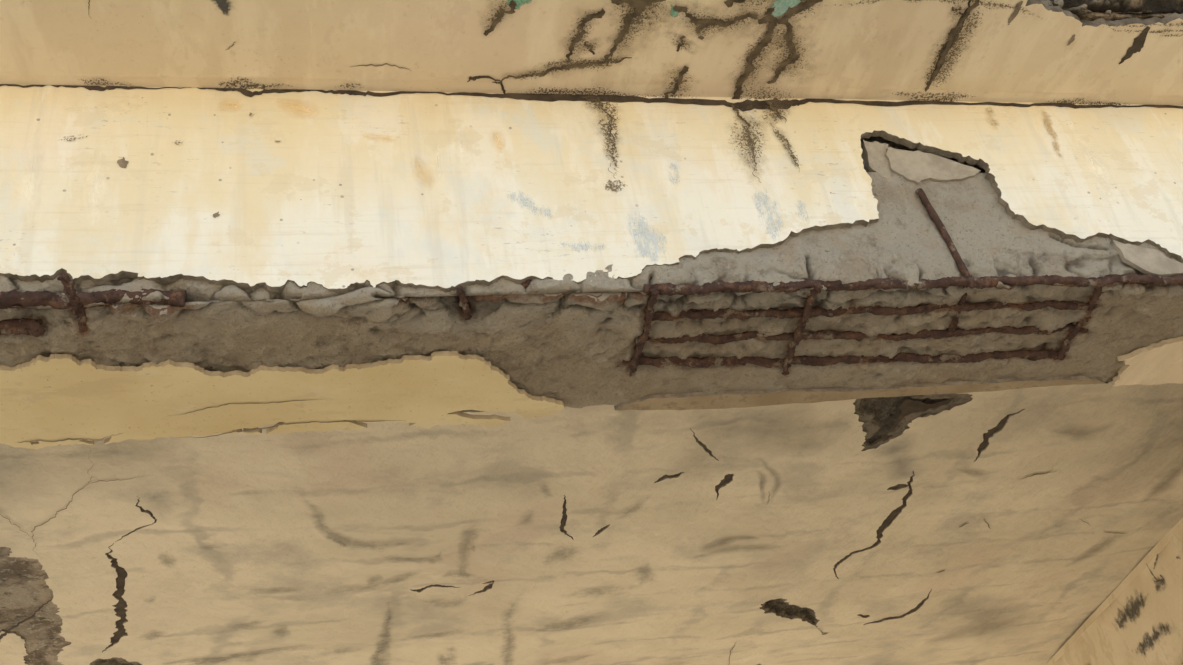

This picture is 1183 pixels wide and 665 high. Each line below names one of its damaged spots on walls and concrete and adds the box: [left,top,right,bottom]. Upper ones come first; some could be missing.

water stain [219,77,289,89]
crack [0,0,1183,112]
water stain [501,0,823,183]
water stain [892,0,1038,102]
spalling [1041,0,1183,21]
water stain [1093,21,1183,37]
spalling [0,140,1183,449]
crack [0,433,156,648]
crack [833,471,914,577]
peeling [0,547,71,665]
spalling [761,598,818,625]
crack [858,570,945,623]